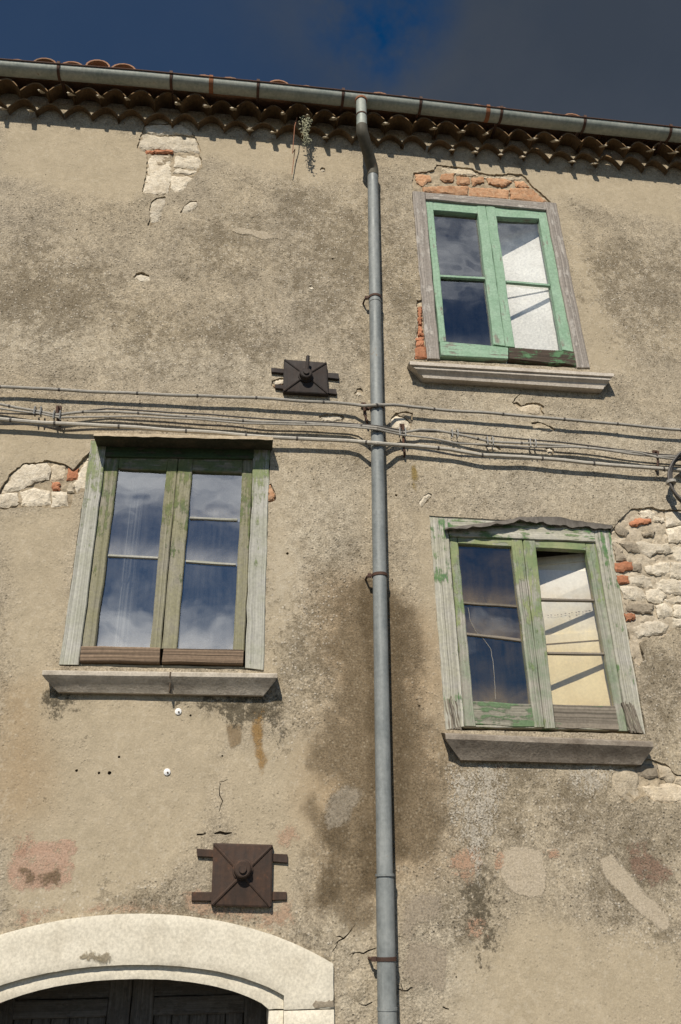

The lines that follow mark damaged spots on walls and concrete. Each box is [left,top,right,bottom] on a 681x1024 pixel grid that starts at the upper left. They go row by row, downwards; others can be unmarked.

spalling [137,125,202,226]
spalling [412,166,548,202]
spalling [0,455,89,511]
spalling [610,508,681,665]
leakage [227,725,241,747]
leakage [306,578,377,930]
leakage [387,595,506,883]
spalling [612,759,681,803]
crack [197,784,232,835]